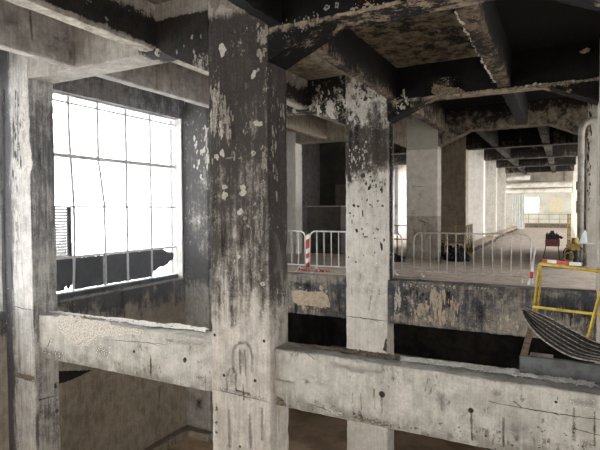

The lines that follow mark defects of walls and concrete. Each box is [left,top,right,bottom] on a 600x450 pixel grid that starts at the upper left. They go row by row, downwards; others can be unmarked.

peeling [280,2,339,39]
peeling [347,0,401,16]
peeling [251,24,268,79]
spalling [454,11,496,83]
peeling [308,82,385,124]
spalling [431,77,474,98]
spalling [508,78,597,90]
peeling [193,81,242,179]
peeling [251,103,285,179]
peeling [347,141,386,193]